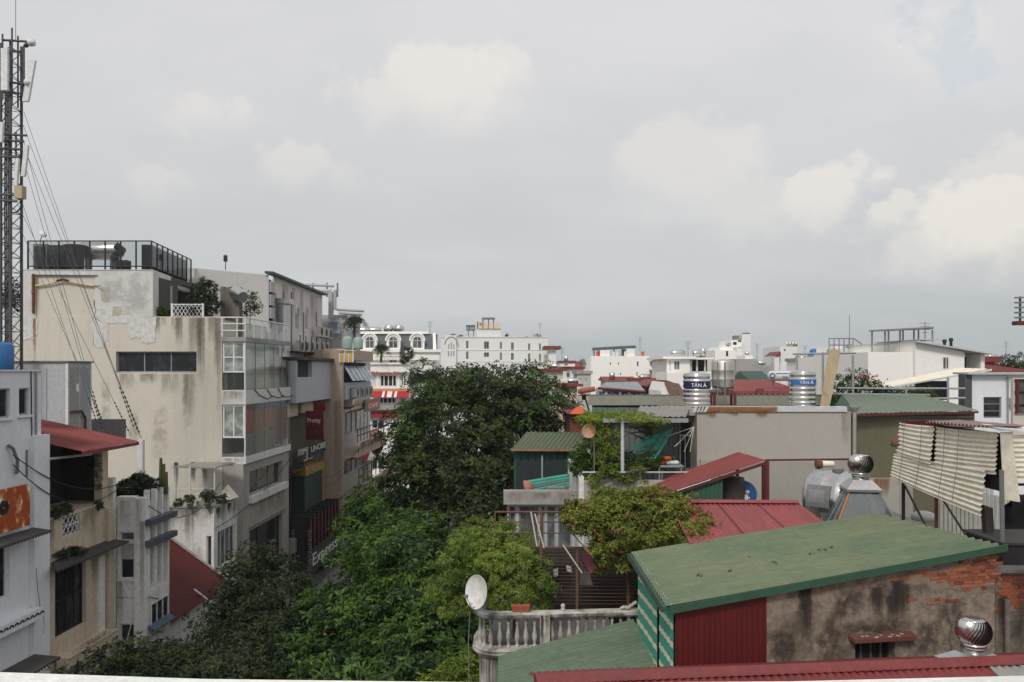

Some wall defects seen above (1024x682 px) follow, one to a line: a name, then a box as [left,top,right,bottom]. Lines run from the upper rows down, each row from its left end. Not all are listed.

peeling [88,287,156,348]
water stain [198,318,220,346]
flaking render [890,555,1024,614]
water stain [773,588,812,660]
water stain [821,580,929,657]